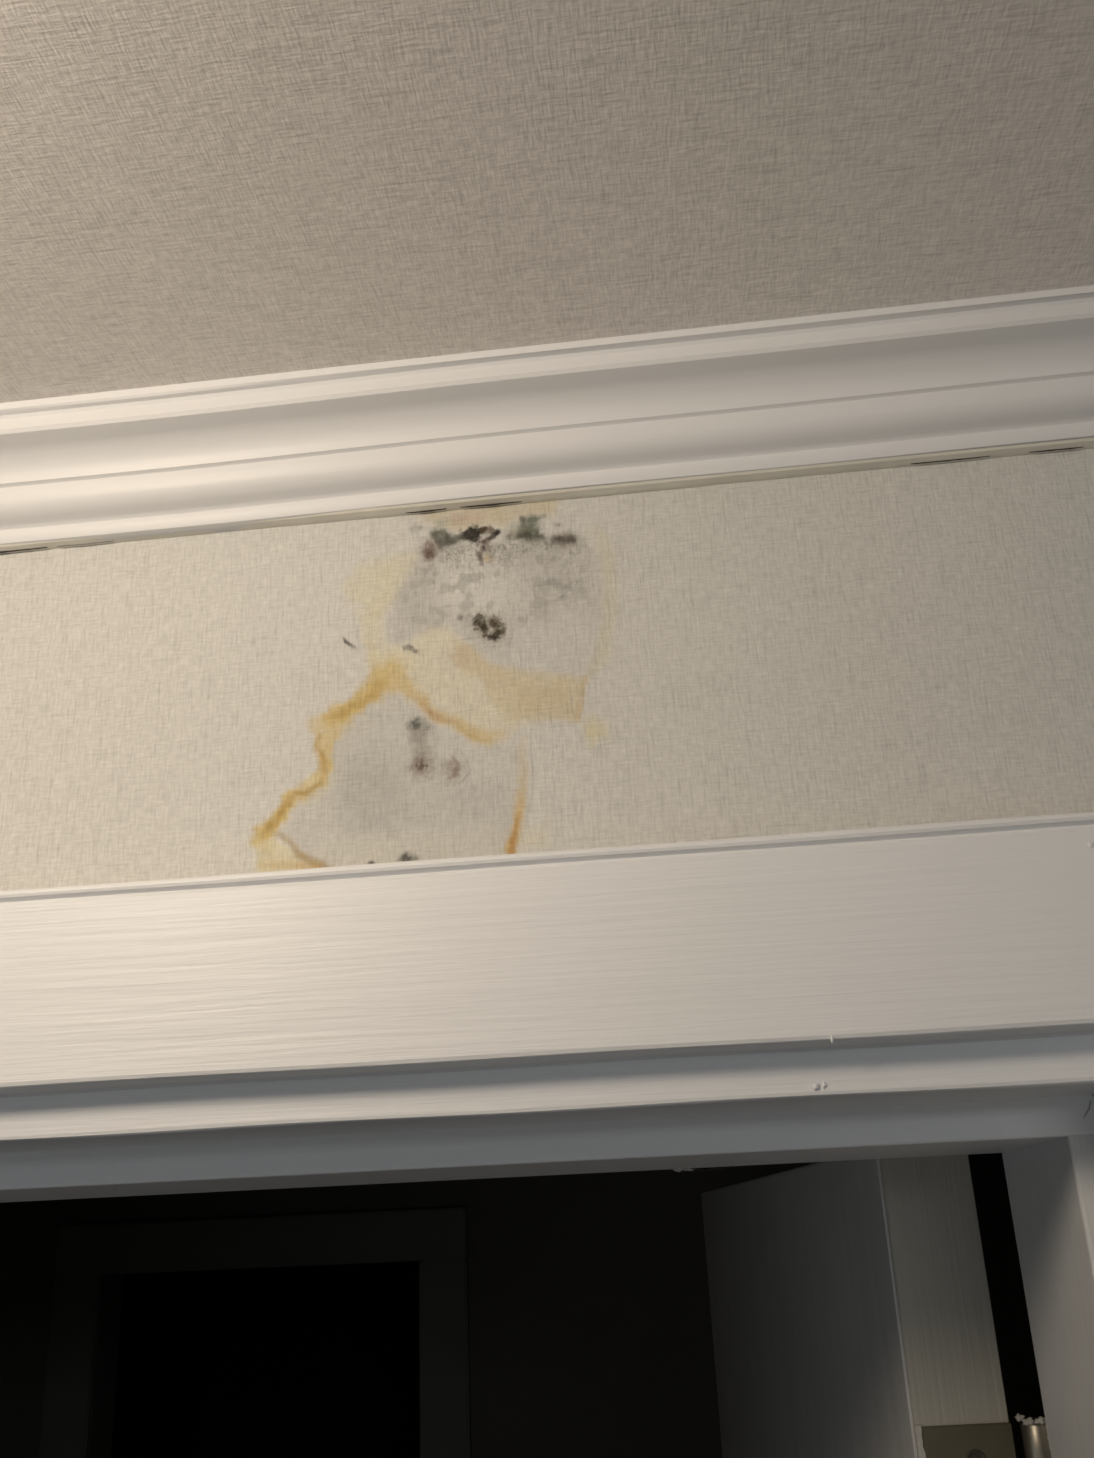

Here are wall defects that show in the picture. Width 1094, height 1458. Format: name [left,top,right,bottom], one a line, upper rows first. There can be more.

leakage [246,500,626,873]